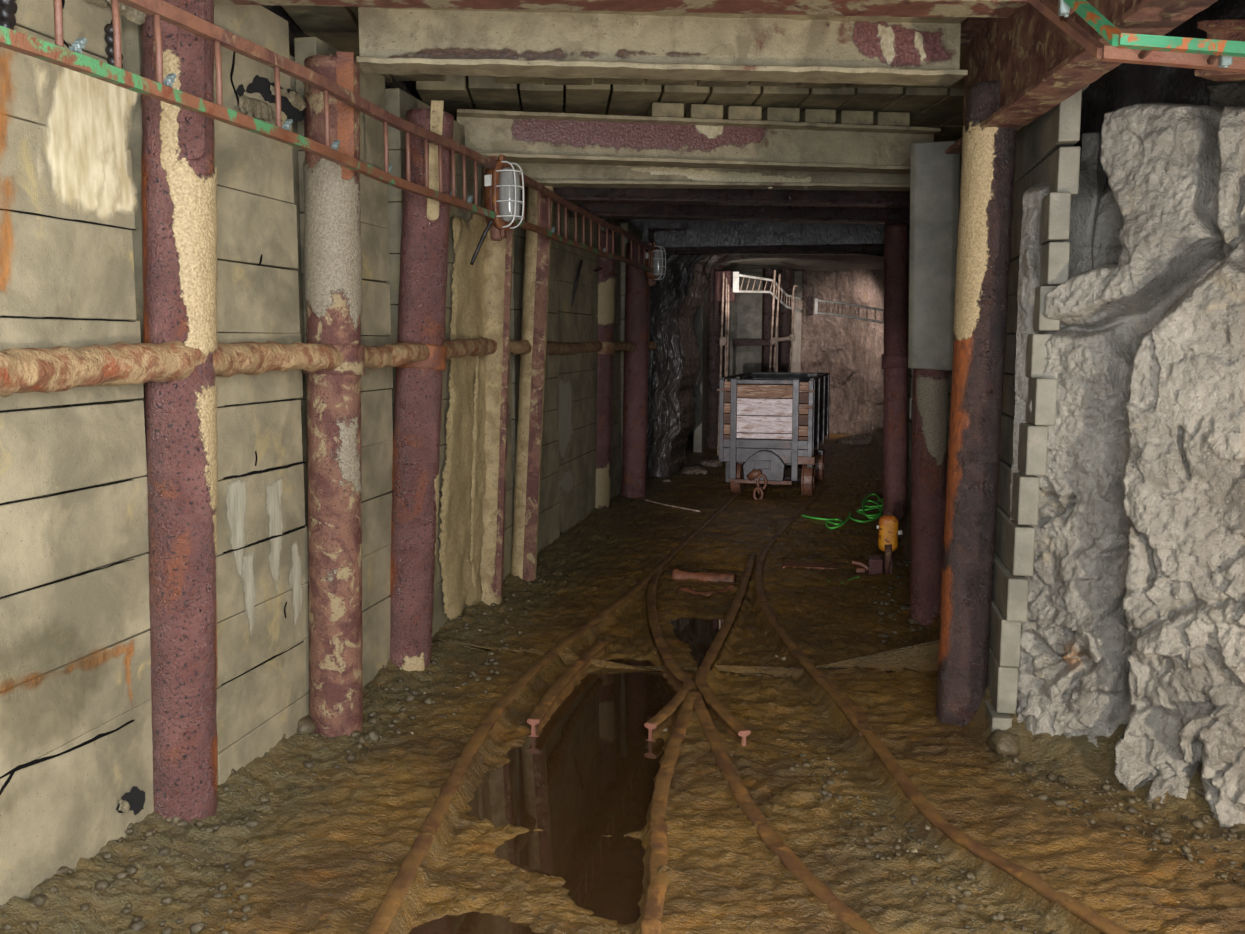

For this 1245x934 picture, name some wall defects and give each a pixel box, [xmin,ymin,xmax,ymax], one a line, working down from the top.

rust [0,56,10,147]
rust [0,214,12,289]
rust [141,151,149,343]
rust [944,337,972,546]
rust [937,567,952,664]
crack [0,720,134,795]